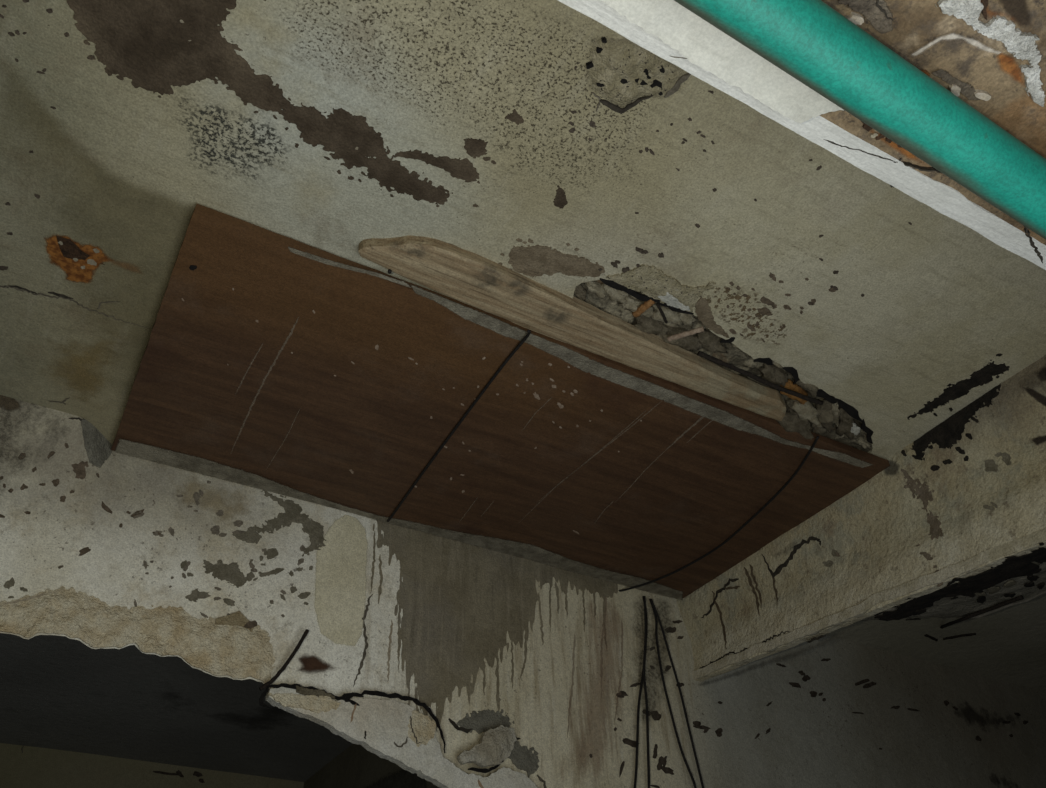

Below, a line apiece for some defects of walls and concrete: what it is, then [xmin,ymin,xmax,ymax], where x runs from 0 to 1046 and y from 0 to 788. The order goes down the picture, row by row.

spalling [1000,0,1030,26]
mould [184,106,283,177]
crack [0,285,147,328]
corrosion [46,236,112,283]
spalling [498,238,874,452]
mould [0,395,34,464]
peeling [0,417,112,502]
spalling [874,353,1046,641]
spalling [0,490,547,788]
crack [259,594,446,753]
damp [370,520,618,739]
crack [699,536,826,669]